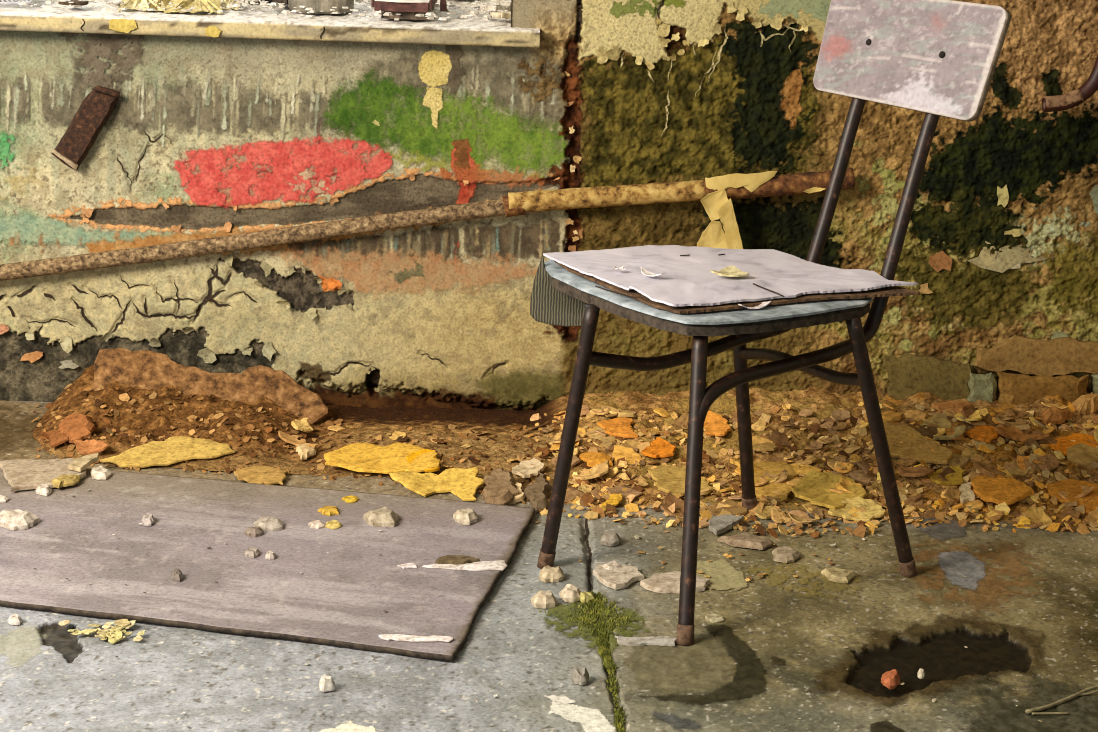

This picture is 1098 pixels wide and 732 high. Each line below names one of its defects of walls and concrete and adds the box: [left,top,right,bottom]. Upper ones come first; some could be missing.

peeling [579,0,831,70]
flaking render [953,0,1098,119]
water stain [0,74,93,130]
water stain [101,75,350,148]
peeling [697,171,777,249]
water stain [855,157,905,244]
water stain [878,62,1098,342]
crack [0,261,258,338]
flaking render [219,254,354,320]
flaking render [0,324,276,402]
crack [585,518,599,621]
spalling [814,615,1046,707]